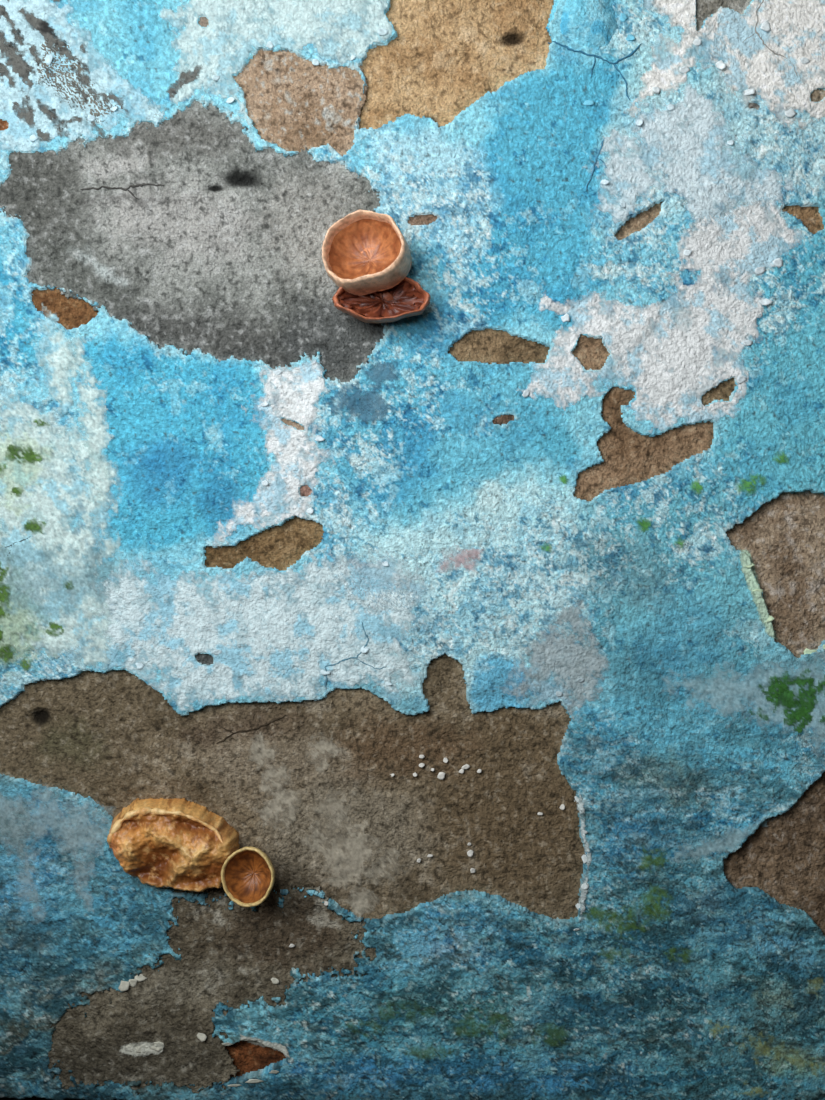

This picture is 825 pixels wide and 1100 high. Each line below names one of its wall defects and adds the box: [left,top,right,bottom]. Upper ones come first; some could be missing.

peeling [0,0,165,151]
spalling [160,0,554,156]
spalling [32,287,99,330]
peeling [448,0,825,501]
damp [0,314,120,665]
spalling [725,490,825,658]
spalling [0,361,608,1096]
damp [684,664,825,752]
damp [677,821,766,856]
spalling [723,772,825,935]